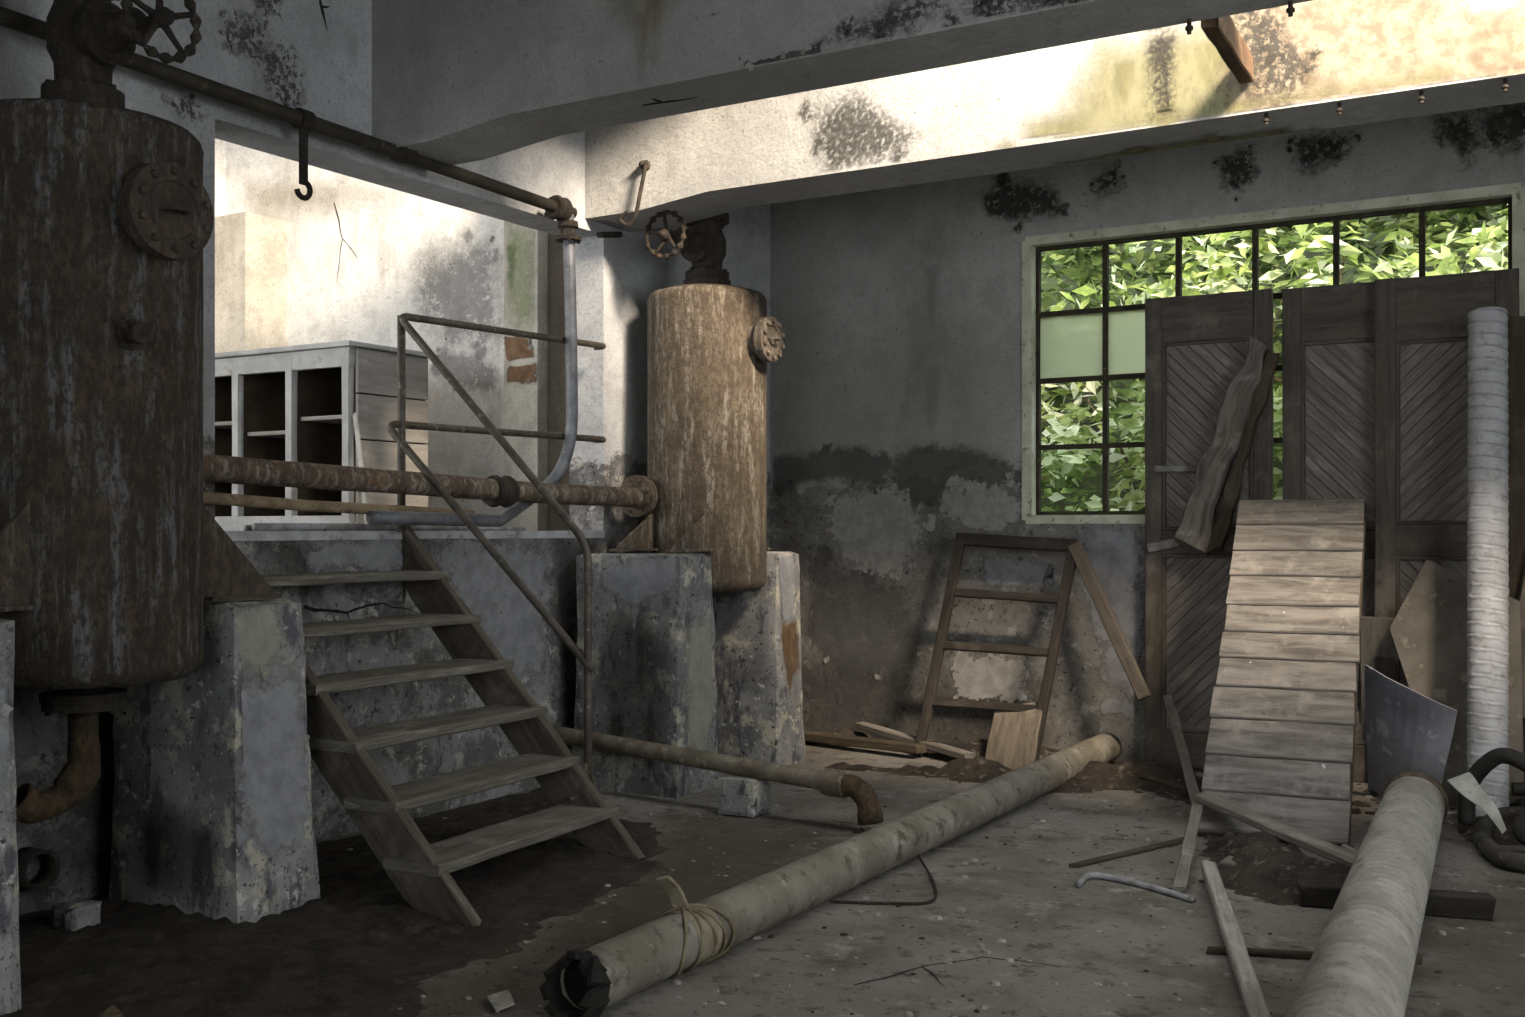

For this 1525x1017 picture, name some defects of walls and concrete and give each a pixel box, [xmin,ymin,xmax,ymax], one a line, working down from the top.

leakage [973,0,1086,17]
leakage [1029,0,1525,138]
leakage [800,99,913,169]
leakage [984,172,1069,233]
leakage [1213,145,1260,201]
leakage [1286,131,1361,174]
leakage [1434,102,1525,164]
rust [783,622,800,688]